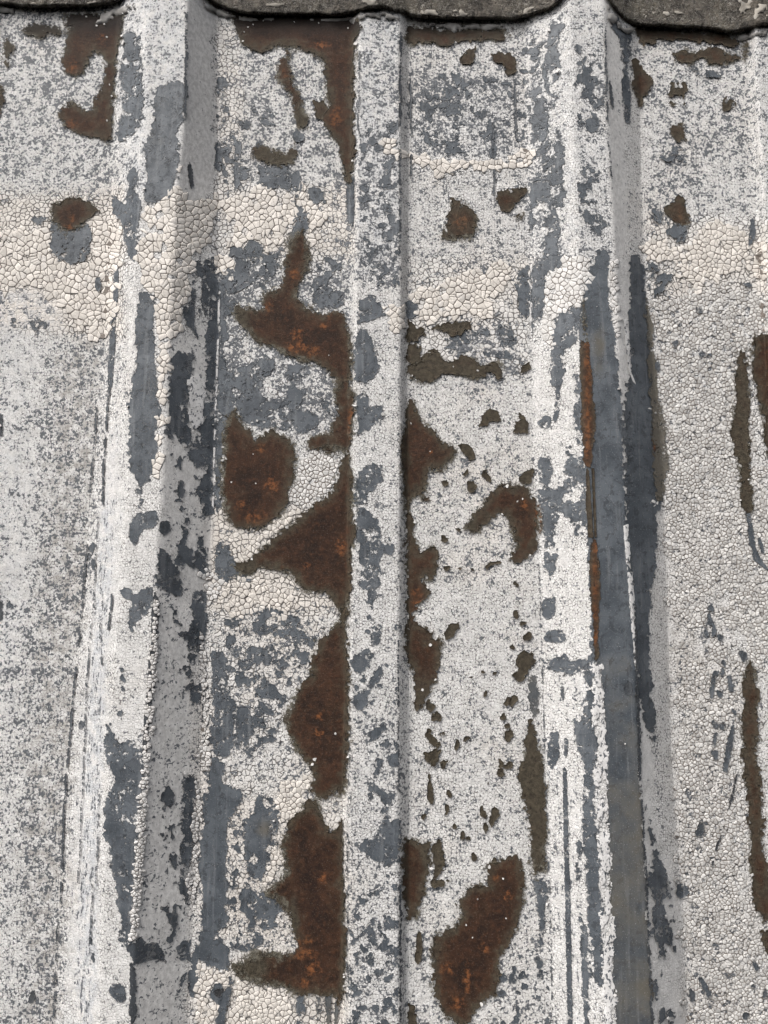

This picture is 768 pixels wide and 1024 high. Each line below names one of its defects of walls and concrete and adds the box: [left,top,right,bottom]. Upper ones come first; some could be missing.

corrosion [1,10,126,145]
peeling [95,264,119,387]
crack [0,166,328,479]
peeling [102,76,333,1024]
corrosion [216,229,357,1006]
corrosion [230,12,364,189]
peeling [347,459,402,1024]
corrosion [398,399,550,1024]
peeling [419,13,690,1024]
crack [382,219,768,1024]
corrosion [729,330,768,513]
corrosion [739,659,768,955]